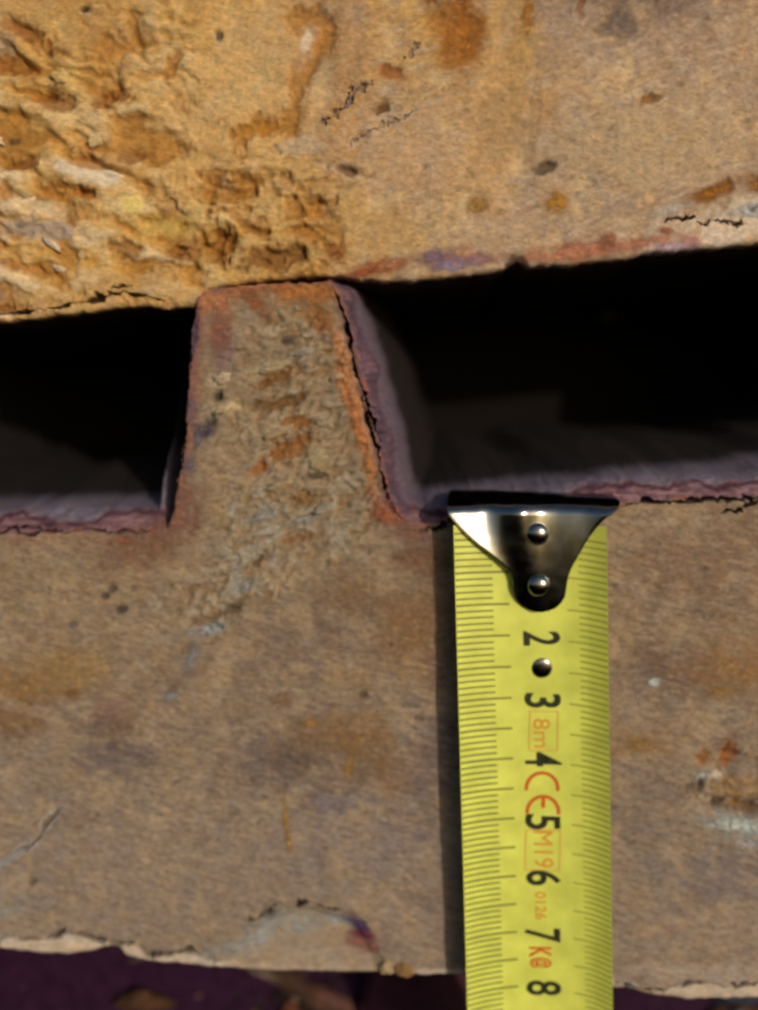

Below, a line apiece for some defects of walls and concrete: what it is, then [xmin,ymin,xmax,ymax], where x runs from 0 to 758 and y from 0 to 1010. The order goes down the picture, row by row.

rust [442,0,483,59]
crack [305,34,430,155]
spalling [371,98,391,116]
spalling [0,0,362,307]
spalling [151,292,387,656]
spalling [99,585,128,614]
spalling [670,734,758,836]
crack [0,802,70,874]
crack [0,923,227,966]
crack [235,894,388,963]